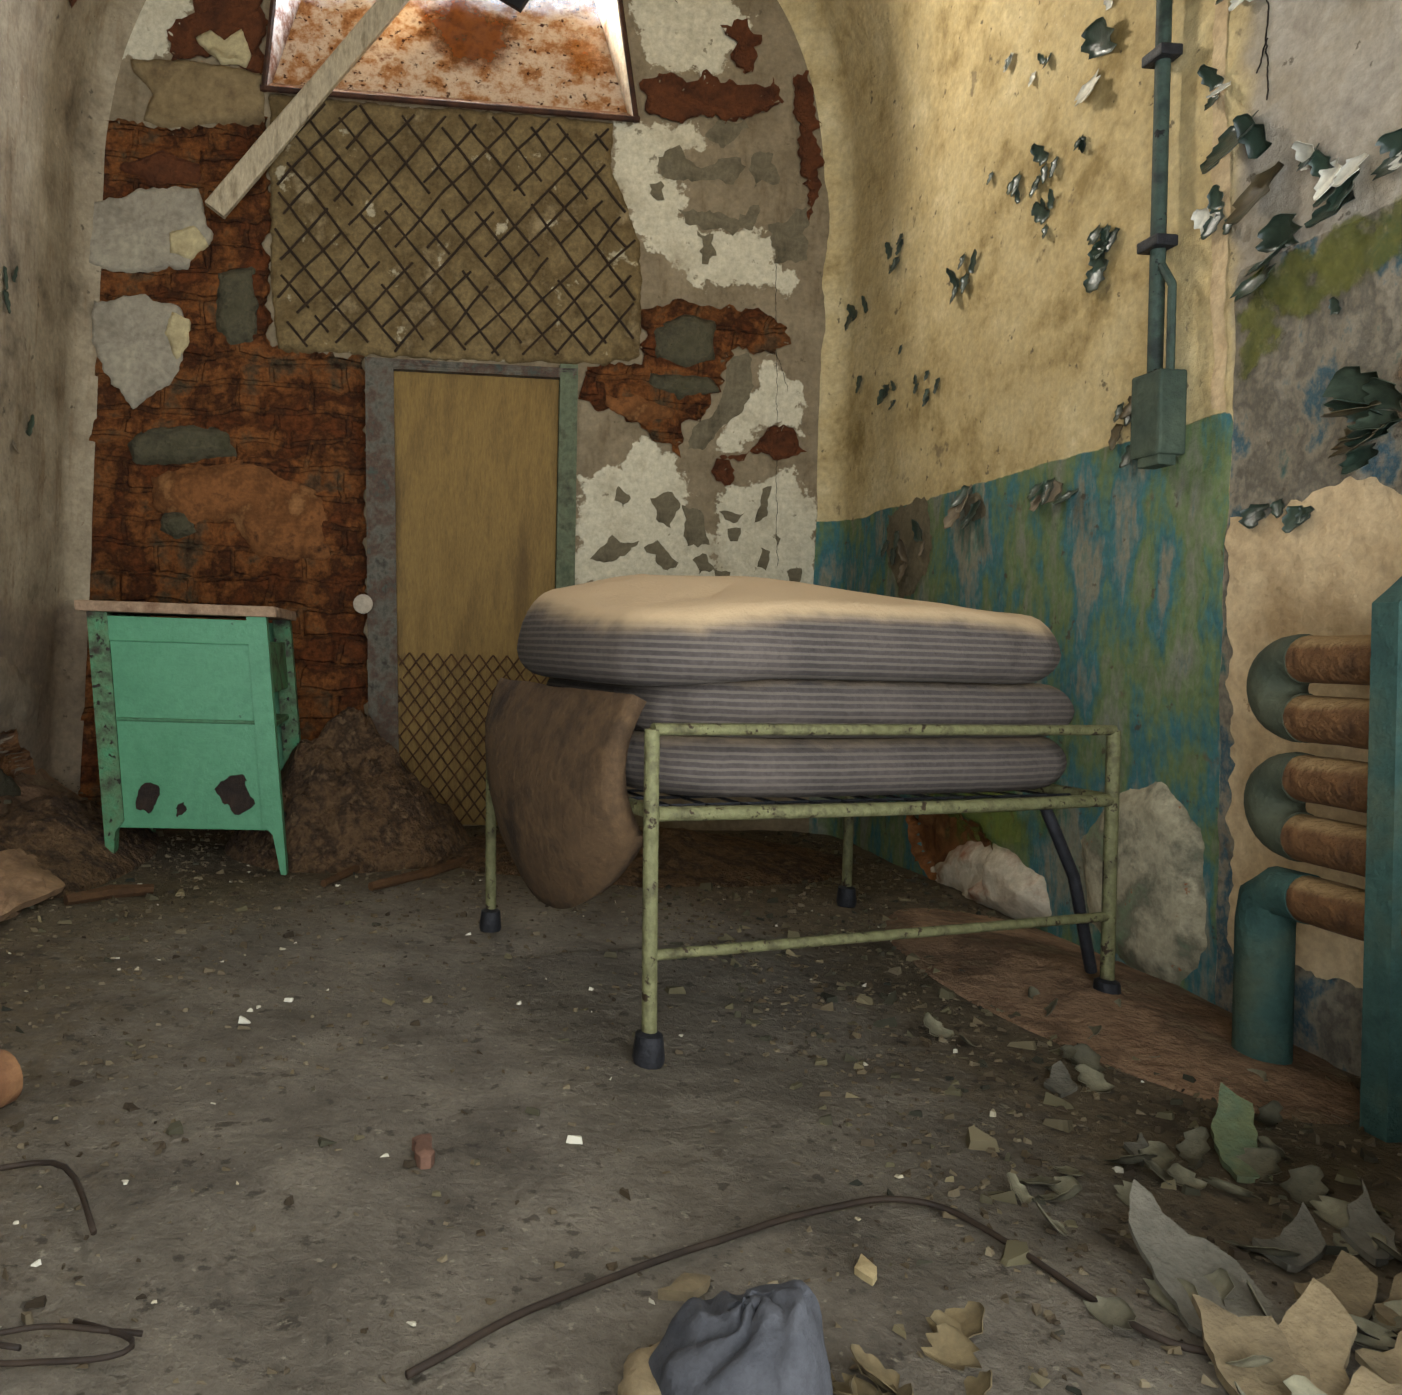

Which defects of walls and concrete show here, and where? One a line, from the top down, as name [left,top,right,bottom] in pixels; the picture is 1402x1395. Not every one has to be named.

peeling [1074,0,1117,107]
spalling [639,18,825,265]
peeling [946,249,977,304]
peeling [1006,134,1086,239]
peeling [1083,223,1120,293]
peeling [1191,0,1402,412]
spalling [81,0,368,741]
spalling [578,299,807,486]
peeling [590,486,772,576]
spalling [78,640,102,806]
peeling [1224,366,1402,954]
peeling [1295,922,1364,988]